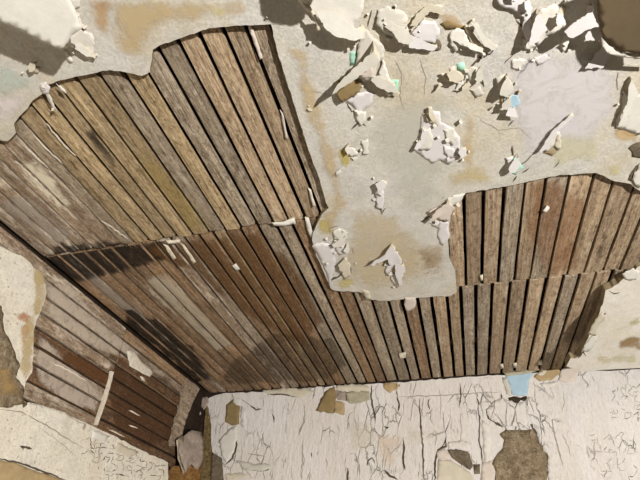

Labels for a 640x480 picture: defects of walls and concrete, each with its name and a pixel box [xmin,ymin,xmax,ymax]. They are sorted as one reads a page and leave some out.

peeling [0,0,98,63]
peeling [298,0,498,130]
peeling [493,0,640,126]
peeling [616,75,640,187]
damp [7,198,321,410]
flaking render [0,306,109,442]
crack [0,409,165,480]
crack [285,402,328,480]
crack [358,385,497,480]
flaking render [436,424,557,480]
crack [527,397,571,476]
crack [590,385,640,480]